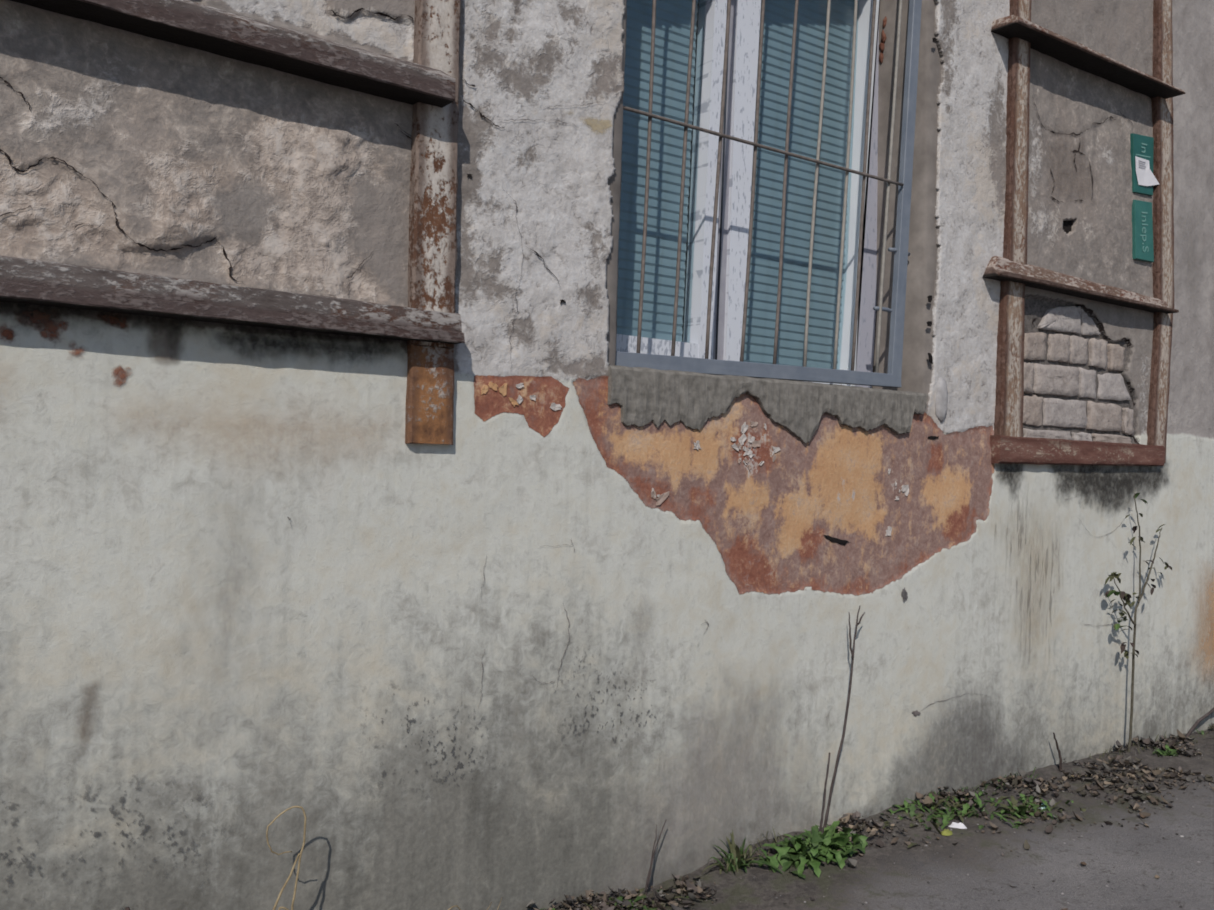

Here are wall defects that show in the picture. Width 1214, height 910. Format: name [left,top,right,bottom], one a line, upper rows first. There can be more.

crack [331,8,413,23]
crack [1033,99,1133,203]
crack [0,149,246,285]
corrosion [0,311,67,340]
corrosion [98,314,128,329]
leakage [152,322,177,359]
corrosion [113,366,128,385]
flaking render [1023,295,1139,444]
peeling [474,375,995,602]